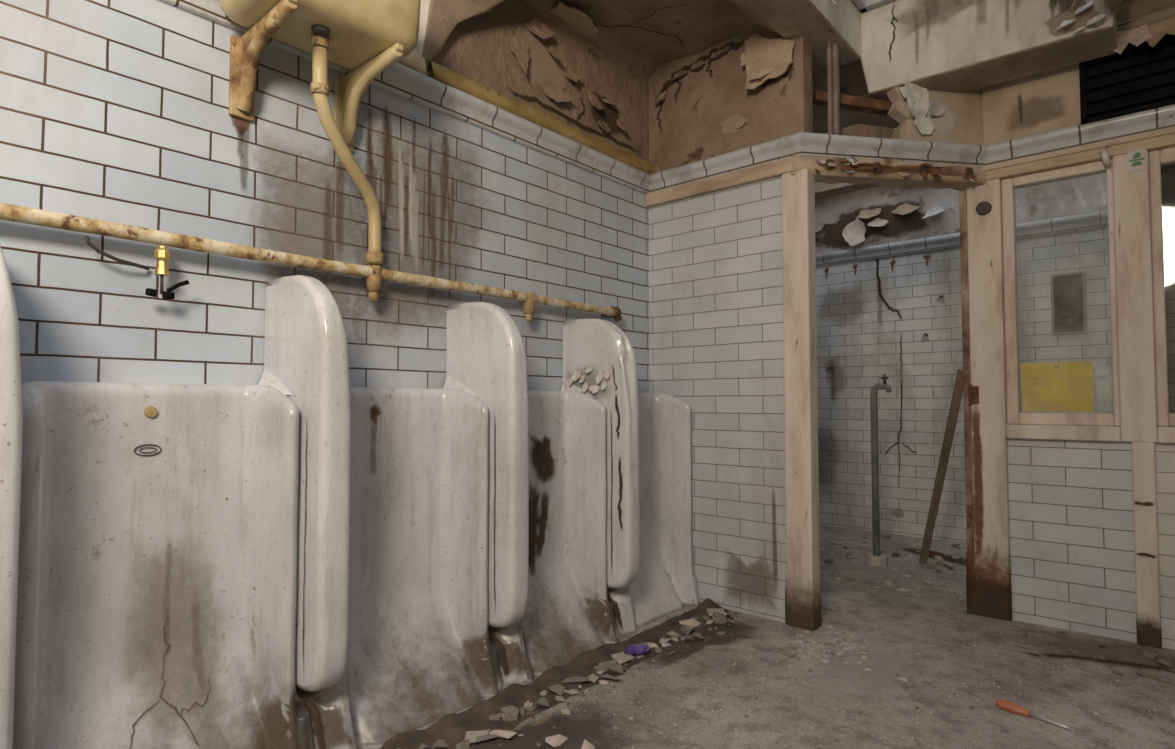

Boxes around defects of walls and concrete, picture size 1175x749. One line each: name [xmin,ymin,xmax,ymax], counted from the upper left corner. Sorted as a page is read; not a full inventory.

spalling [1046,0,1107,36]
peeling [1113,16,1175,55]
crack [593,3,743,130]
flaking render [740,33,795,90]
rust [814,157,977,183]
flaking render [815,202,944,248]
damp [966,412,1012,621]
damp [785,593,822,631]